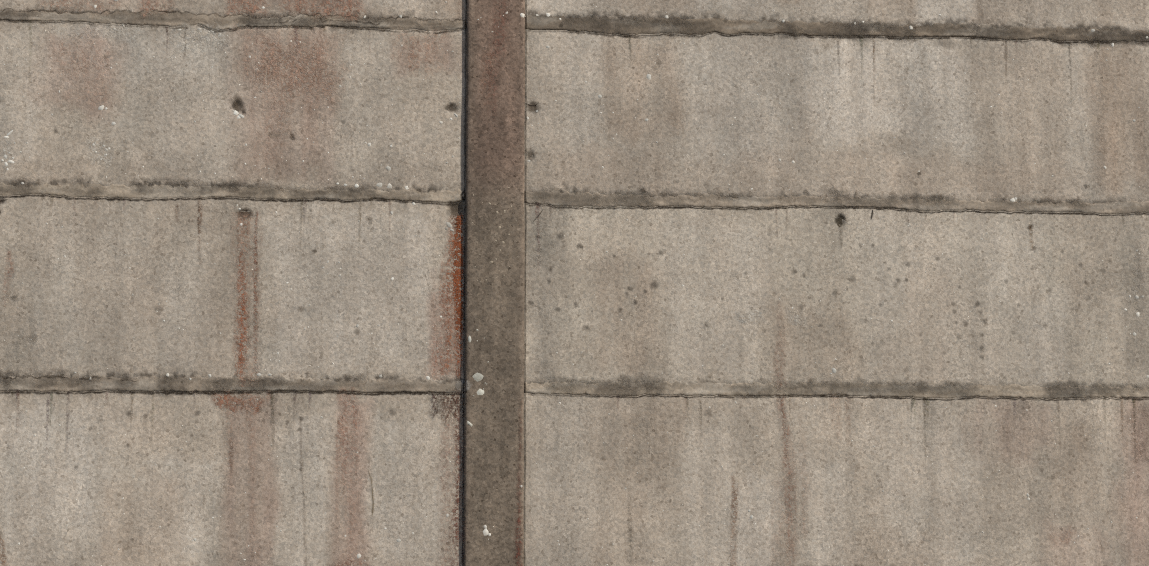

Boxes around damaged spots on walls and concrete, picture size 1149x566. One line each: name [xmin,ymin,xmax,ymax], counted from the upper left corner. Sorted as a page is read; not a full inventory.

crack [0,8,466,205]
corrosion [432,214,463,375]